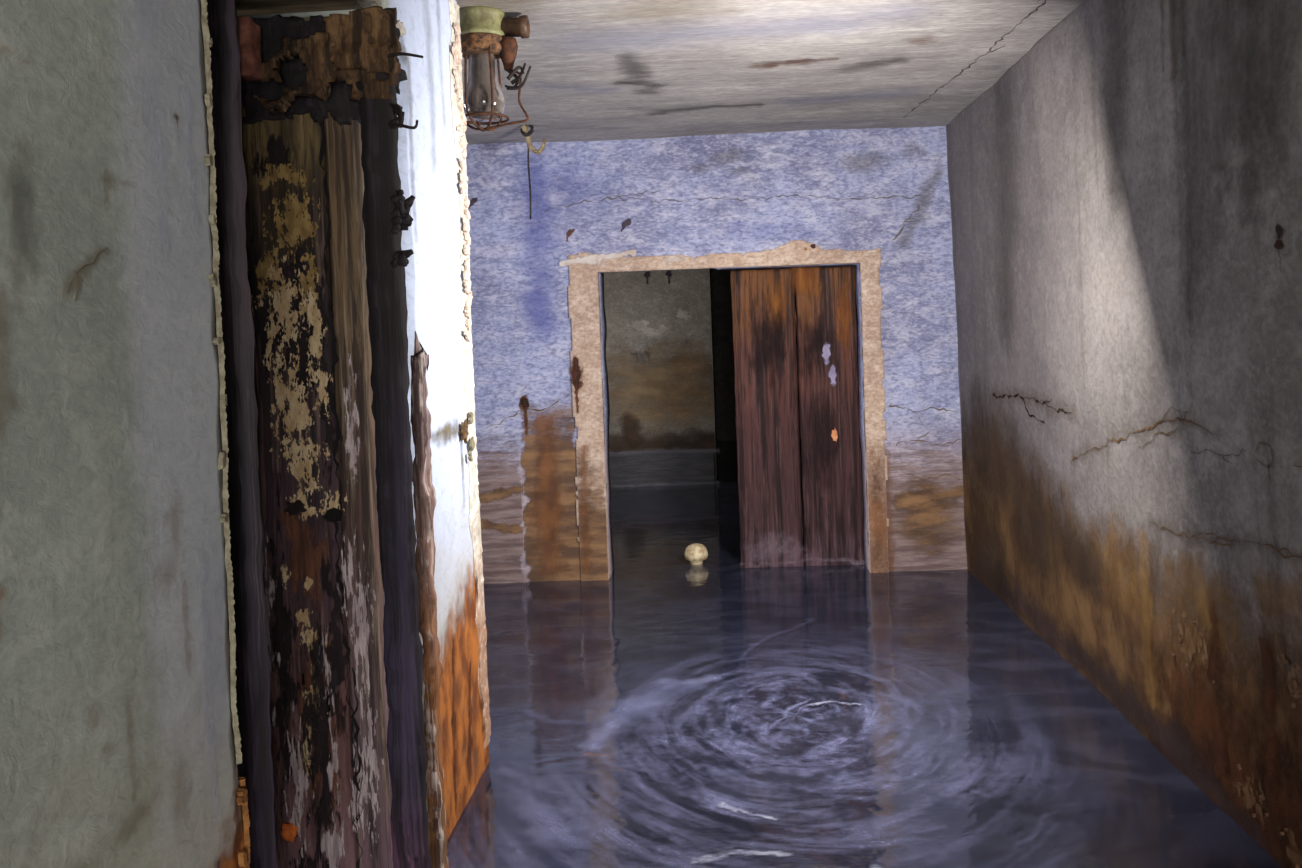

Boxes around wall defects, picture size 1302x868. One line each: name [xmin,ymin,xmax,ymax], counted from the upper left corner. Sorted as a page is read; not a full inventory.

spalling [201,0,250,868]
peeling [249,163,360,521]
peeling [272,533,384,868]
corrosion [439,573,489,840]
water stain [477,408,608,584]
water stain [886,408,1096,591]
crack [993,393,1071,423]
corrosion [962,436,1302,868]
crack [1072,407,1244,464]
crack [1152,522,1302,559]